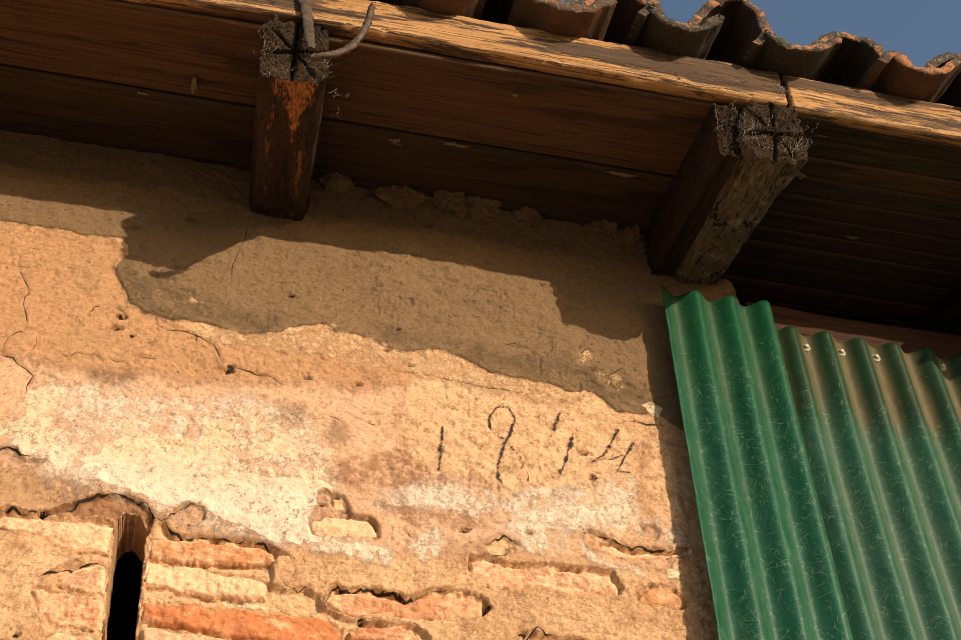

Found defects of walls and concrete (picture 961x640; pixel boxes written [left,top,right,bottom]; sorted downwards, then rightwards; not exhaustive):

crack [2,262,48,394]
crack [159,326,281,385]
crack [0,493,446,605]
peeling [0,383,491,640]
peeling [383,366,692,596]
crack [589,531,687,554]
spalling [636,582,686,610]